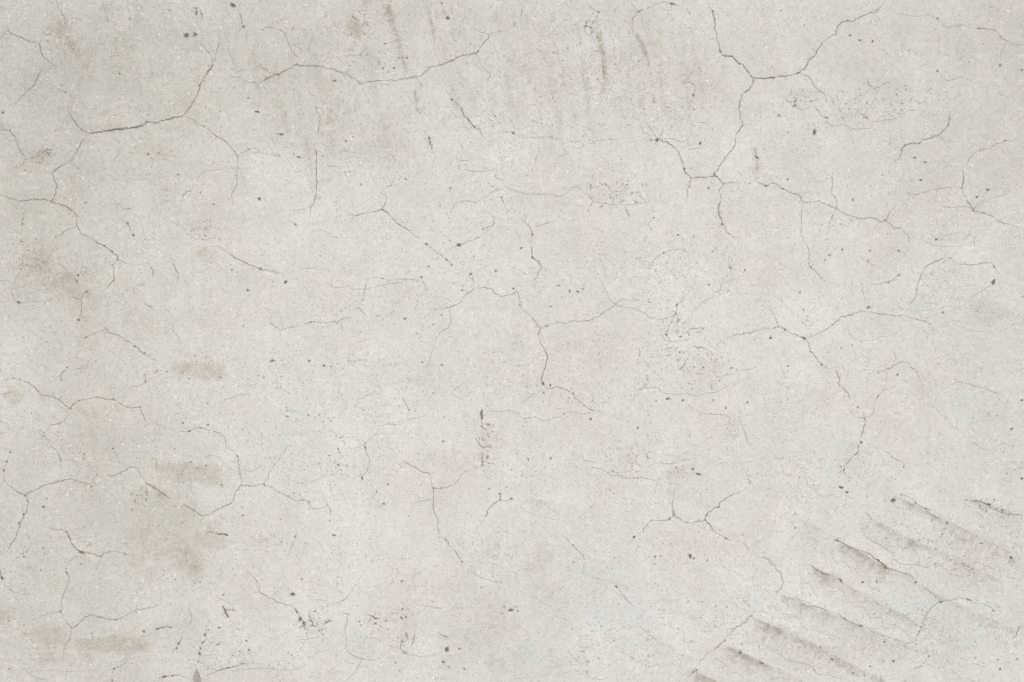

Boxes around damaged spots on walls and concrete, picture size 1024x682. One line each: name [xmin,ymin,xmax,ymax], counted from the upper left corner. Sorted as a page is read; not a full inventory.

crack [8,64,213,353]
crack [650,8,879,234]